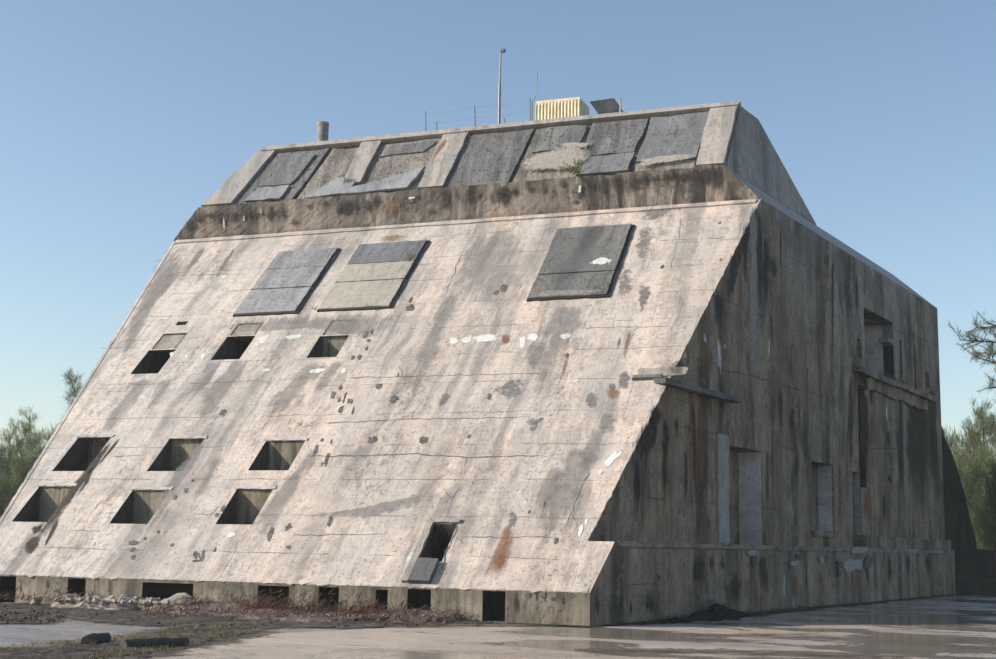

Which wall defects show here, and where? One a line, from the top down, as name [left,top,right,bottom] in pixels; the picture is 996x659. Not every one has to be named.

damp [186,206,297,230]
damp [324,195,380,216]
damp [428,181,567,214]
damp [636,210,669,258]
damp [715,208,782,390]
spalling [341,329,374,373]
peeling [449,334,498,344]
peeling [520,333,538,348]
spalling [331,385,355,414]
damp [632,406,678,503]
rust [492,526,512,569]
peeling [843,546,869,573]